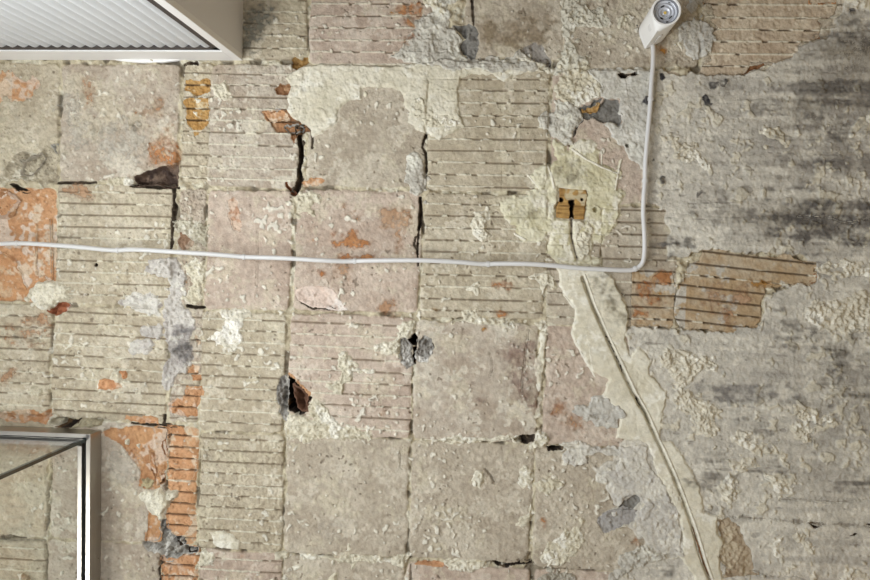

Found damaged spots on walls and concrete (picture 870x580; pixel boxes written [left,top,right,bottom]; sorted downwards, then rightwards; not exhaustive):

spalling [674,0,837,76]
spalling [183,78,211,137]
peeling [262,0,658,170]
water stain [799,79,870,106]
crack [285,124,314,196]
crack [420,134,428,177]
spalling [0,143,60,307]
crack [413,197,423,266]
water stain [762,200,870,246]
spalling [631,249,817,333]
spalling [102,361,205,542]
peeling [559,440,684,557]